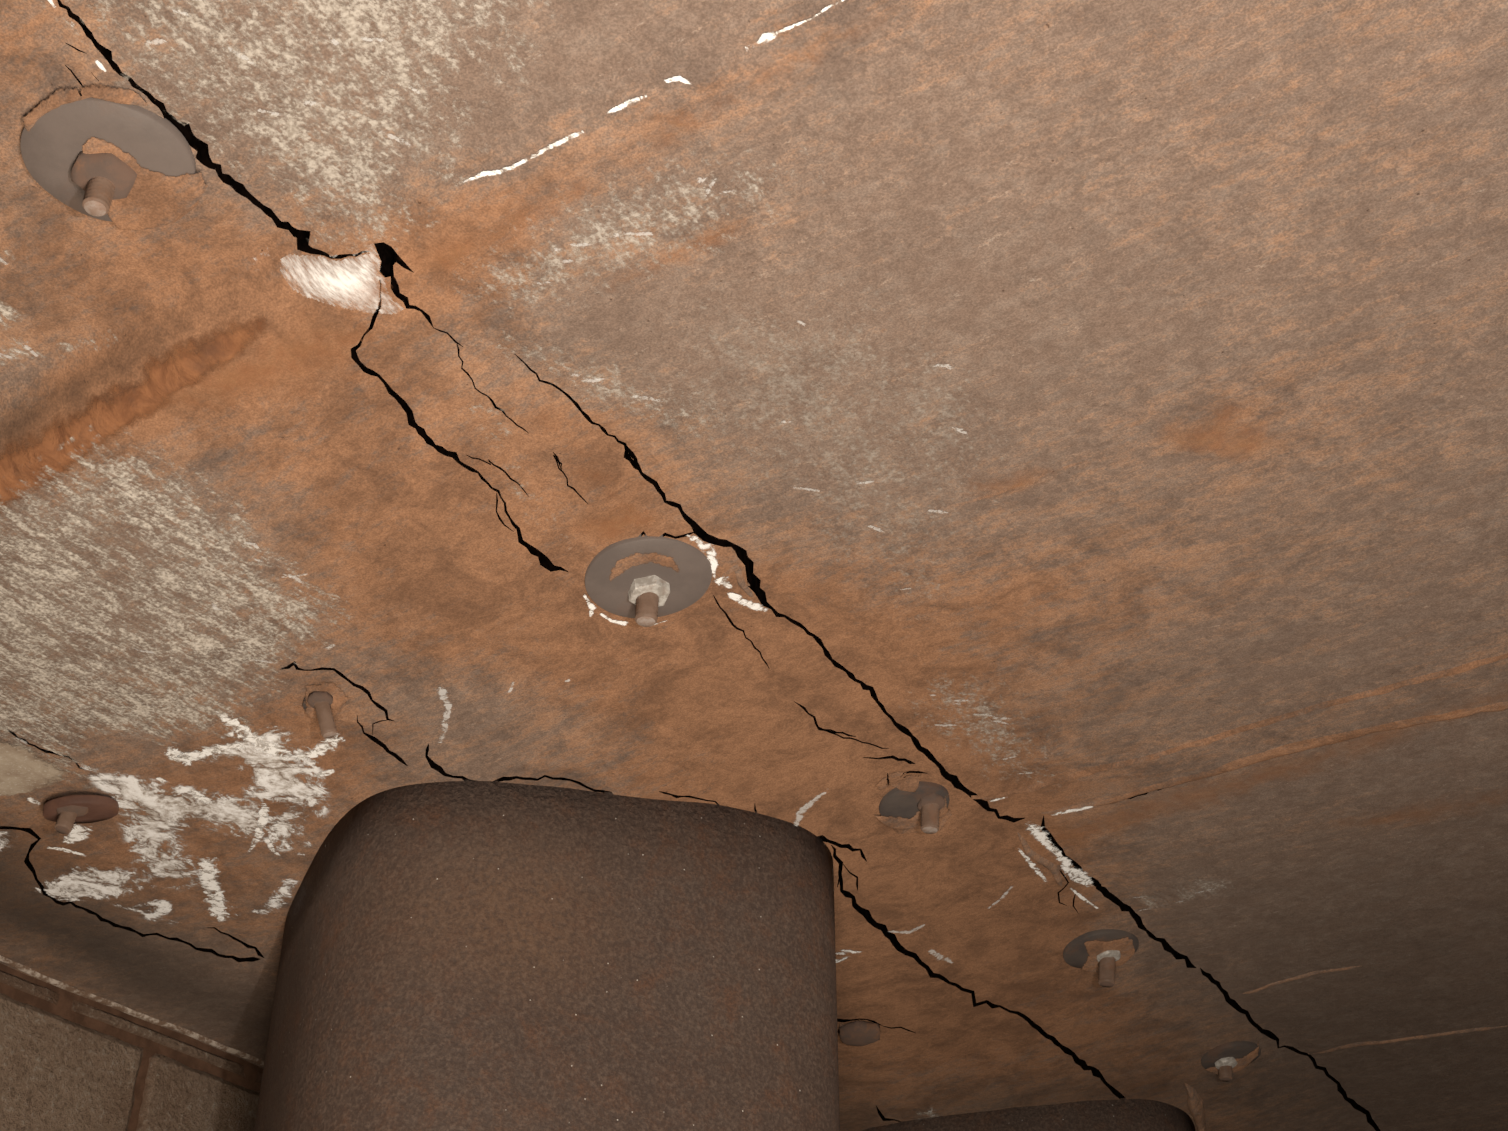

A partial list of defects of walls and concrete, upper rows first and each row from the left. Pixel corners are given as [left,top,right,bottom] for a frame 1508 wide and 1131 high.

efflorescence [126,0,504,313]
efflorescence [444,131,584,182]
efflorescence [608,95,647,113]
efflorescence [665,76,690,84]
efflorescence [745,0,845,48]
crack [57,0,588,572]
spalling [374,242,414,277]
crack [2,727,85,770]
leakage [0,437,349,924]
crack [280,661,610,793]
crack [515,354,1381,1131]
crack [0,826,264,962]